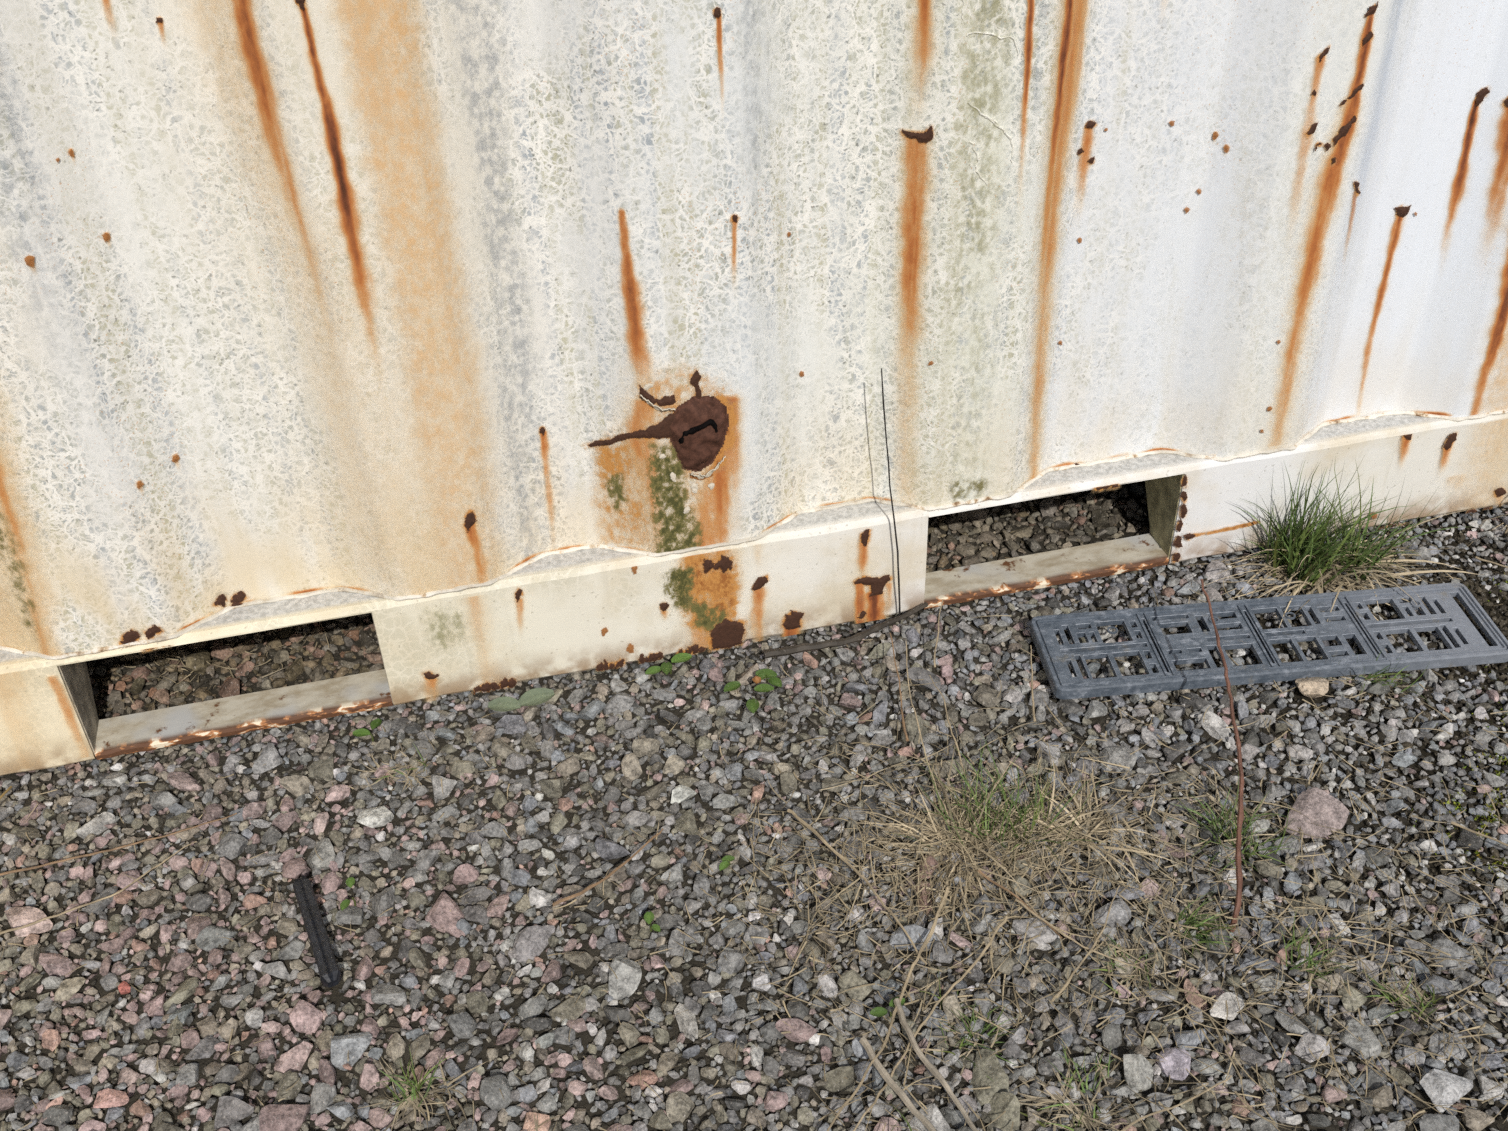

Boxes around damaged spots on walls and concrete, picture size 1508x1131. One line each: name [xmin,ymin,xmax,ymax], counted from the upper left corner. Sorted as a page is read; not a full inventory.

rust [232,0,310,256]
rust [294,0,372,333]
rust [619,209,649,374]
rust [901,126,934,354]
rust [1022,0,1035,147]
rust [1032,0,1108,479]
rust [1267,2,1378,417]
rust [1361,205,1417,389]
rust [1446,87,1508,232]
rust [1471,251,1508,451]
rust [596,550,769,671]
rust [853,529,893,624]